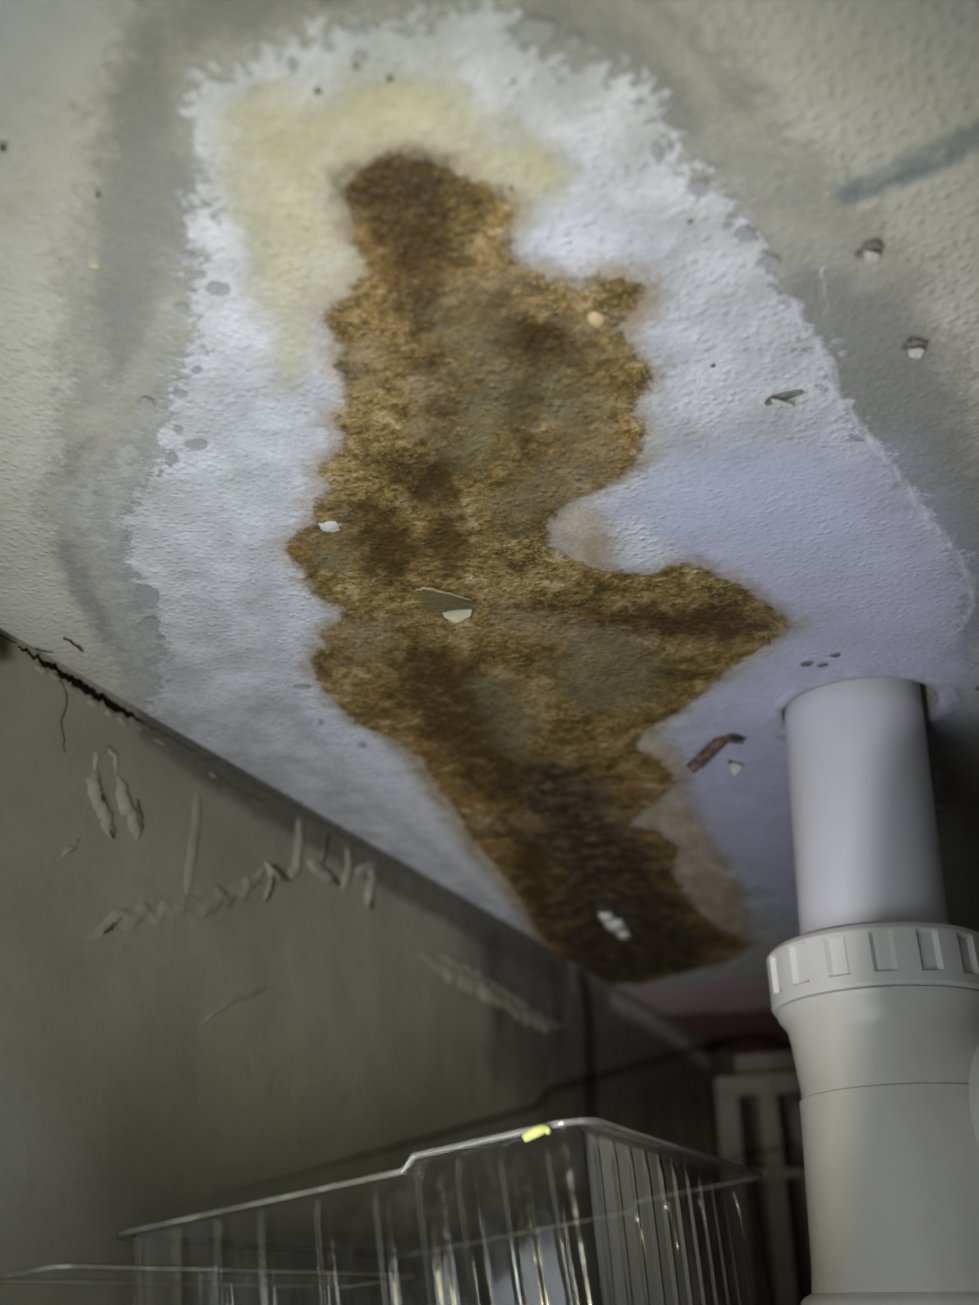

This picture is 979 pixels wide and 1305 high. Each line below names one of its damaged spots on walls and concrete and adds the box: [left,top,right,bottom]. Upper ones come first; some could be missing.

peeling [853,240,882,263]
peeling [764,390,803,409]
peeling [901,339,927,359]
water stain [41,0,979,979]
peeling [411,587,472,623]
rust [284,148,790,985]
crack [1,634,273,803]
peeling [84,788,377,941]